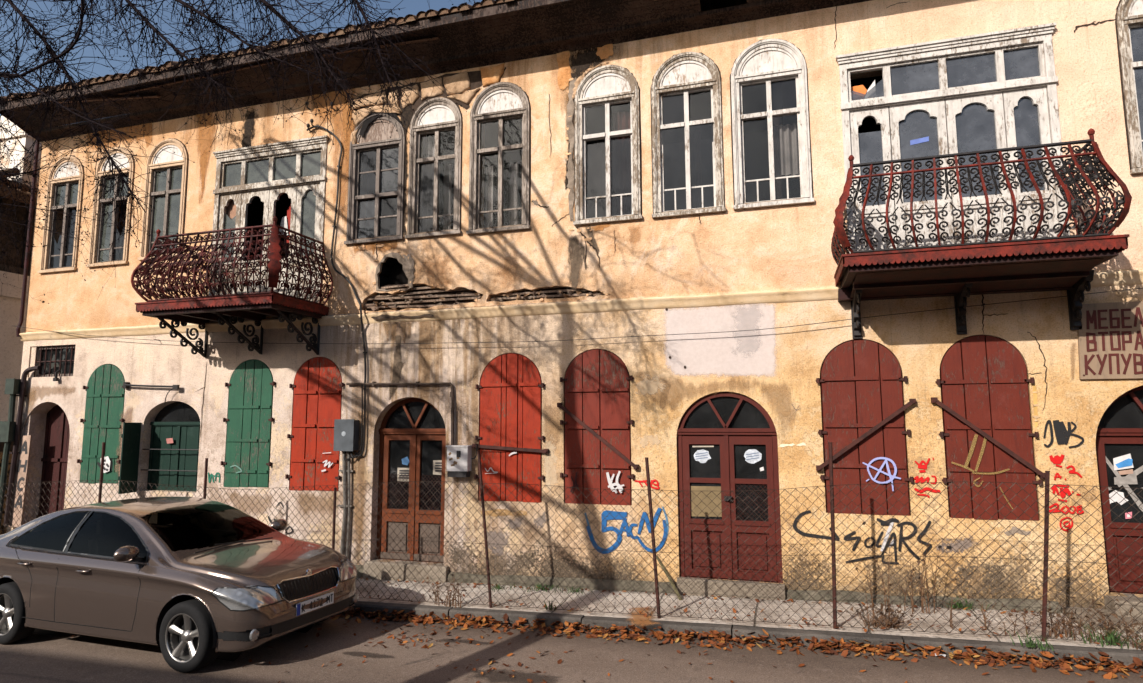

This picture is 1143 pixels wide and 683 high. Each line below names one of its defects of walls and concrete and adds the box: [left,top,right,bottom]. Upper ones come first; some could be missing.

spalling [596,44,614,59]
spalling [556,51,610,241]
spalling [355,243,415,291]
leakage [581,225,599,269]
crack [981,295,1005,333]
crack [1027,332,1047,411]